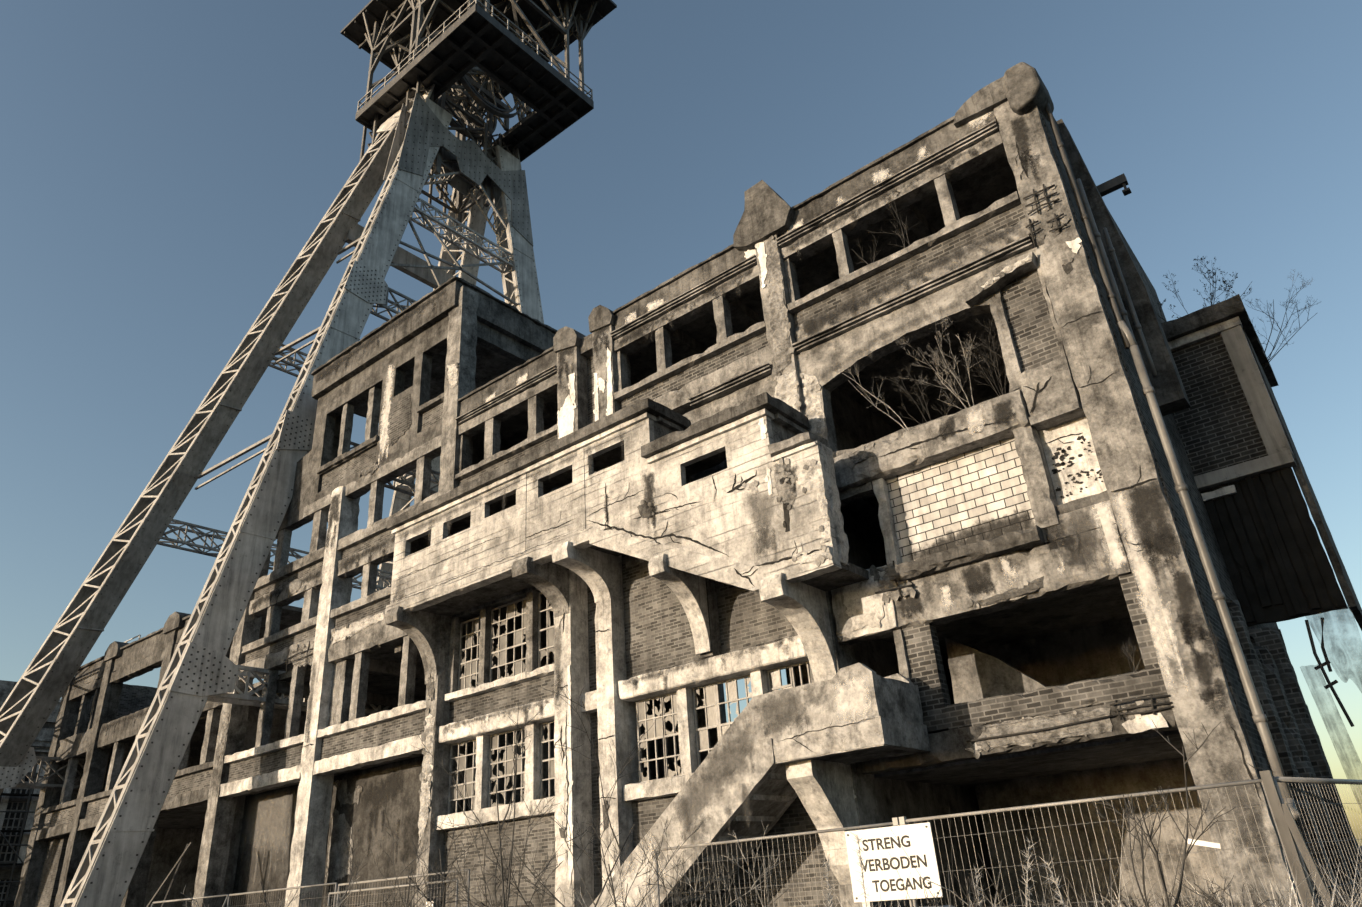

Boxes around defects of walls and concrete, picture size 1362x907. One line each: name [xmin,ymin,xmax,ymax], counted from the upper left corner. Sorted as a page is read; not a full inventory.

peeling [557,373,577,439]
peeling [593,347,613,421]
peeling [1051,435,1103,498]
crack [391,470,822,603]
peeling [842,561,916,632]
leakage [910,481,1233,727]